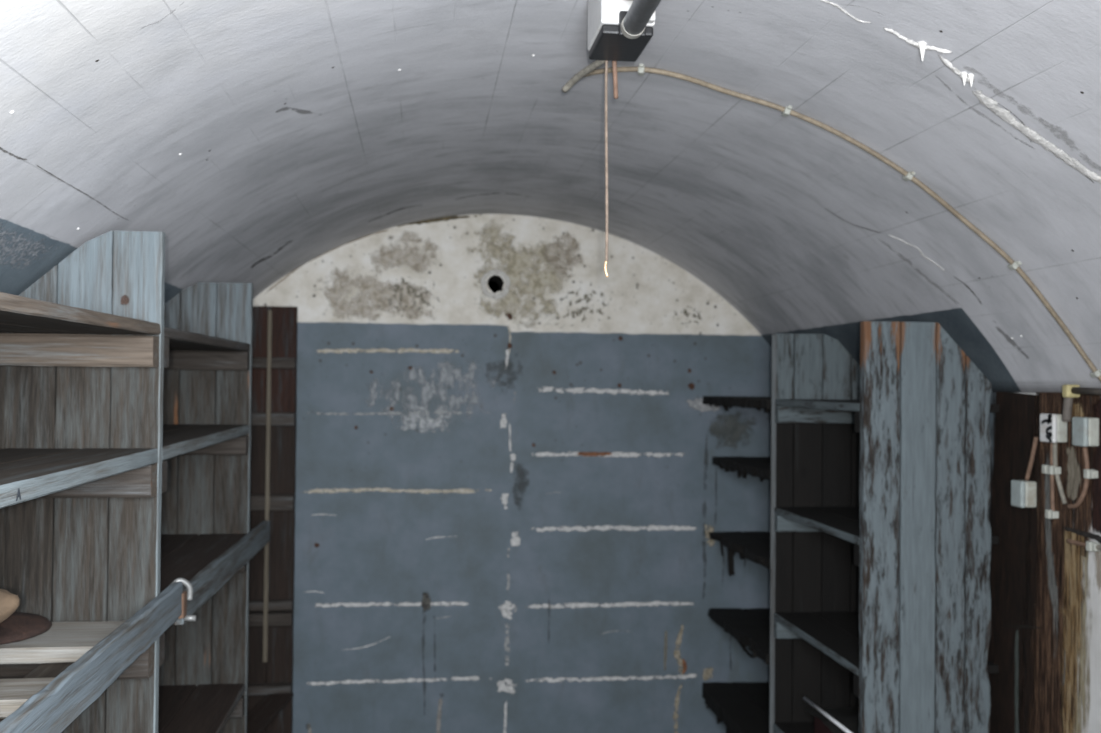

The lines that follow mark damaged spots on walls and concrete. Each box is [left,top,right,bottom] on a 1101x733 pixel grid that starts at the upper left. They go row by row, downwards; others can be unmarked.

crack [821,0,1101,184]
crack [0,147,128,220]
water stain [267,205,477,320]
water stain [471,224,612,327]